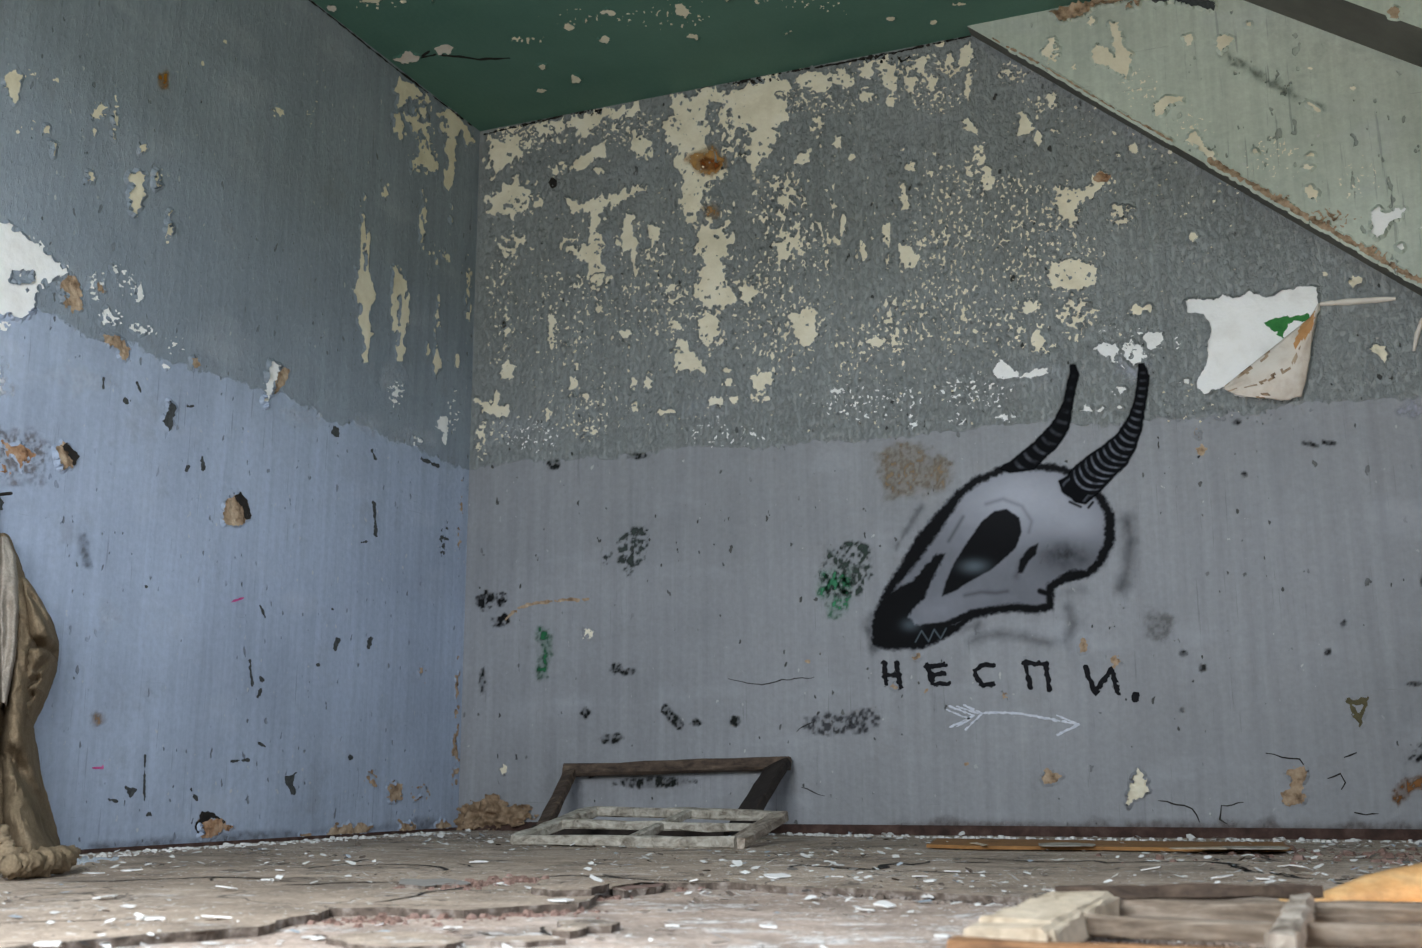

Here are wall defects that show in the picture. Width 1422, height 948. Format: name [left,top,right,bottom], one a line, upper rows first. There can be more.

rust [686,146,725,175]
peeling [391,0,1422,468]
peeling [0,219,157,364]
peeling [350,182,411,408]
flaking render [220,492,252,529]
flaking render [50,767,559,915]
crack [81,859,472,902]
crack [549,873,749,882]
peeling [570,831,1422,944]
crack [789,856,1356,884]
crack [1,918,257,948]
crack [475,927,552,936]